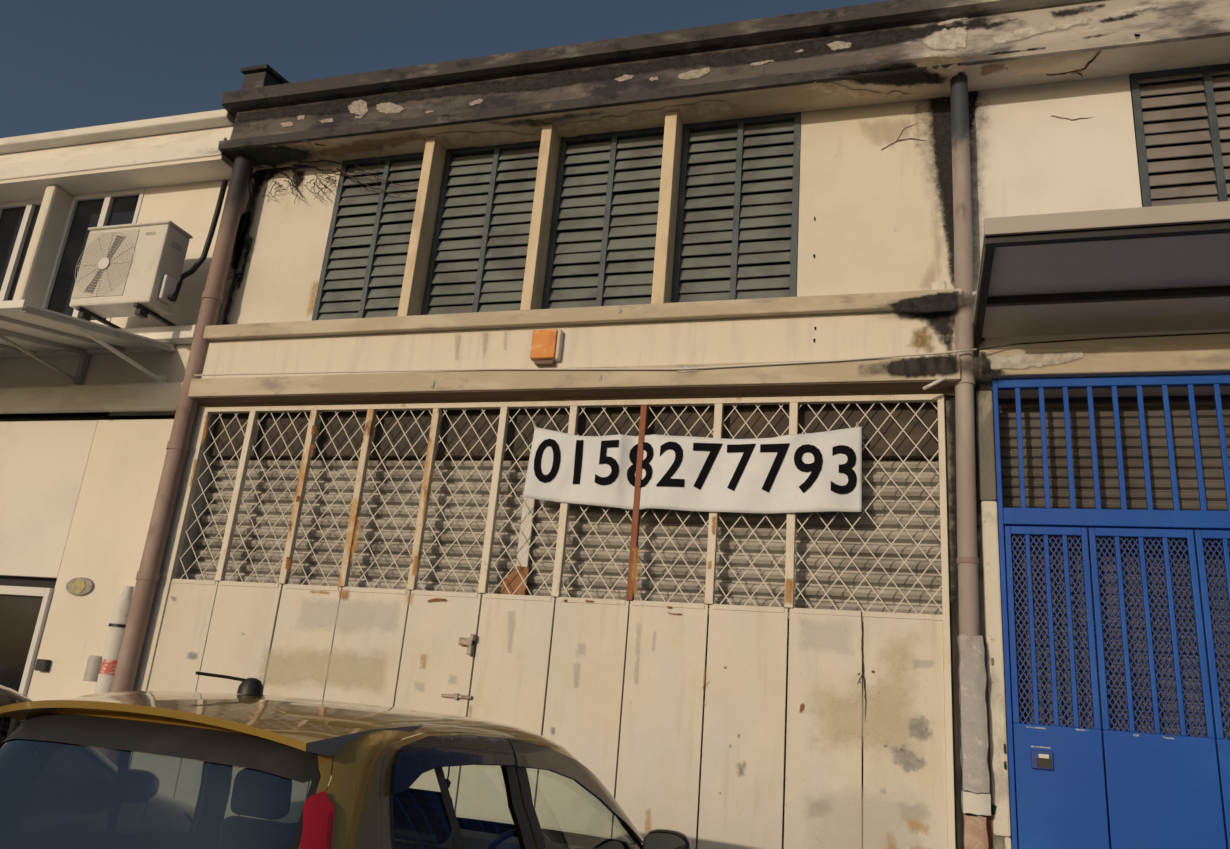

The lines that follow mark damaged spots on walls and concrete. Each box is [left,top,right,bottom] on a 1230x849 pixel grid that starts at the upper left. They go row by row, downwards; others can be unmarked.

peeling [827,41,852,51]
peeling [913,17,968,73]
peeling [992,17,1092,45]
peeling [678,67,711,80]
damp [982,47,1045,75]
crack [1046,50,1101,78]
peeling [796,78,910,100]
damp [216,133,419,325]
damp [838,62,1004,557]
flaking render [960,806,993,849]